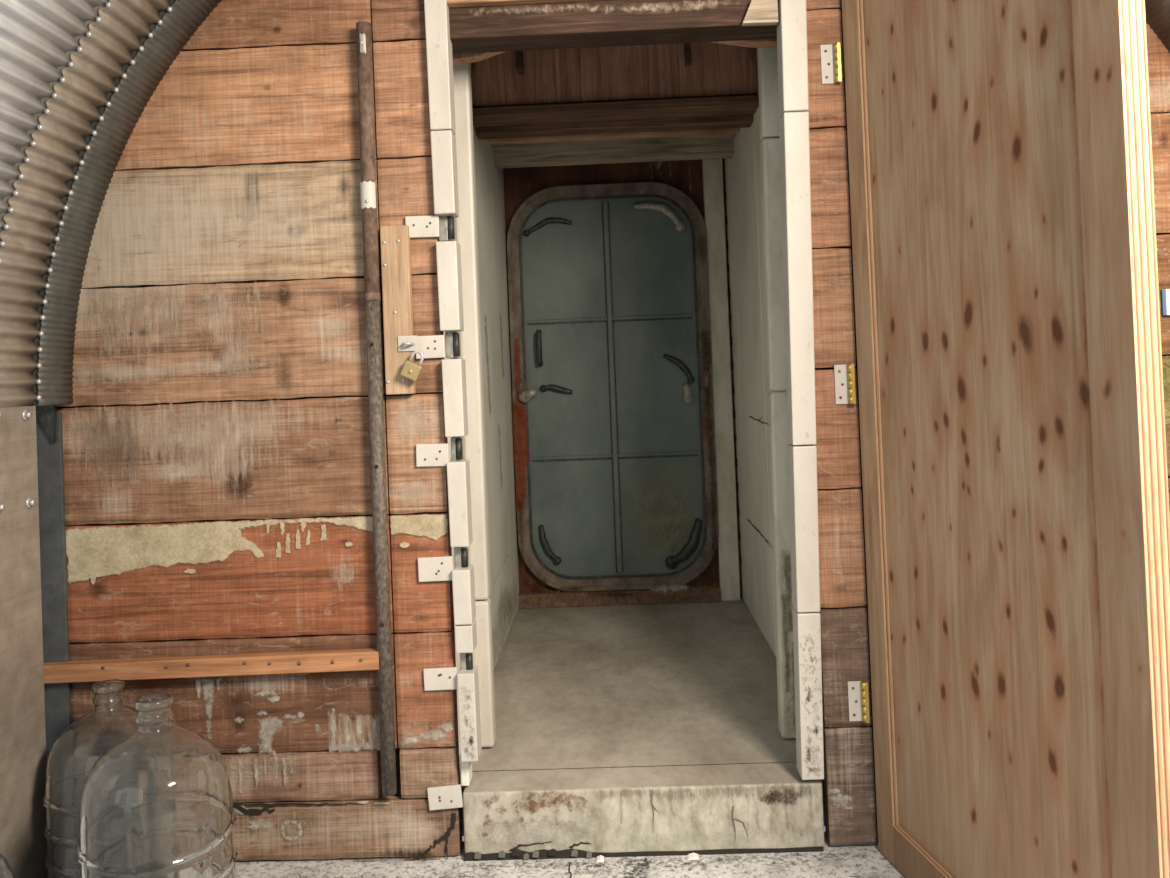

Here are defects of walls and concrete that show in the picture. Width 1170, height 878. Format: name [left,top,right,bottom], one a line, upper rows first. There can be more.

peeling [66,516,373,584]
peeling [390,514,448,548]
crack [409,813,456,861]
spalling [464,841,824,863]